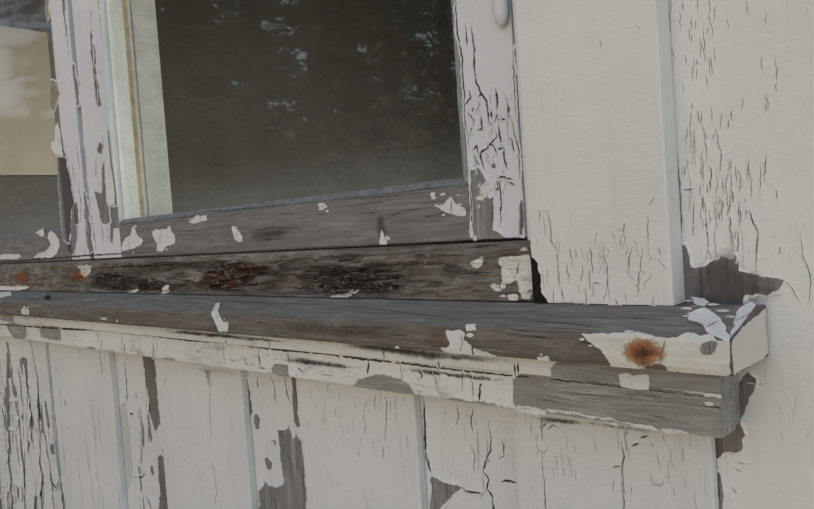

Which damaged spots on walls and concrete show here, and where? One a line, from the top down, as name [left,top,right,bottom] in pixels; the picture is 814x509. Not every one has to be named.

peeling [34,122,176,259]
peeling [430,164,533,301]
crack [453,0,523,227]
crack [532,197,667,328]
crack [668,0,814,309]
peeling [0,306,63,509]
peeling [257,360,309,509]
peeling [440,324,497,357]
crack [480,349,699,509]
corrosion [623,339,664,365]
peeling [511,241,788,509]
crack [716,458,746,497]